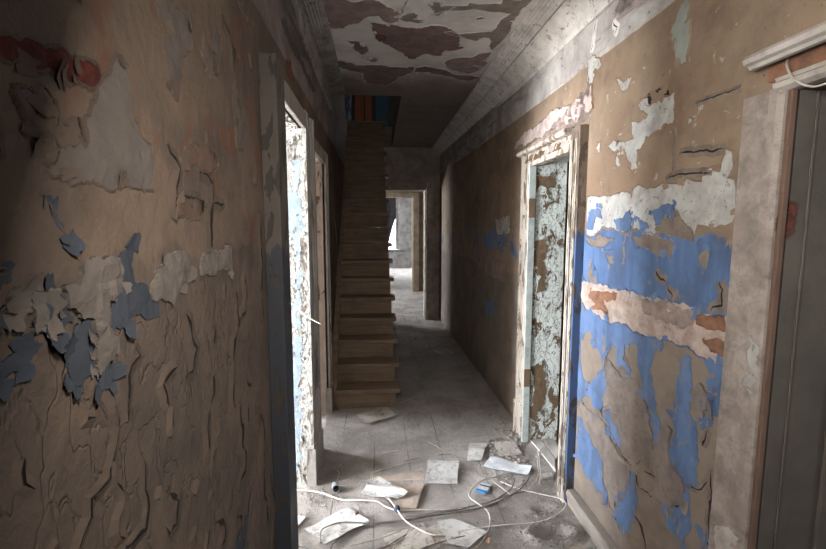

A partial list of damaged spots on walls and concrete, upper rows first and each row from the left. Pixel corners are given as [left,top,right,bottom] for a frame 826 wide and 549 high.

peeling [323,0,533,86]
peeling [285,117,300,164]
peeling [536,172,557,202]
flaking render [514,54,603,150]
peeling [594,85,694,172]
peeling [584,148,737,275]
peeling [289,214,306,361]
peeling [533,237,549,294]
peeling [294,384,309,478]
peeling [529,359,549,423]
peeling [580,339,698,535]
flaking render [581,263,727,431]